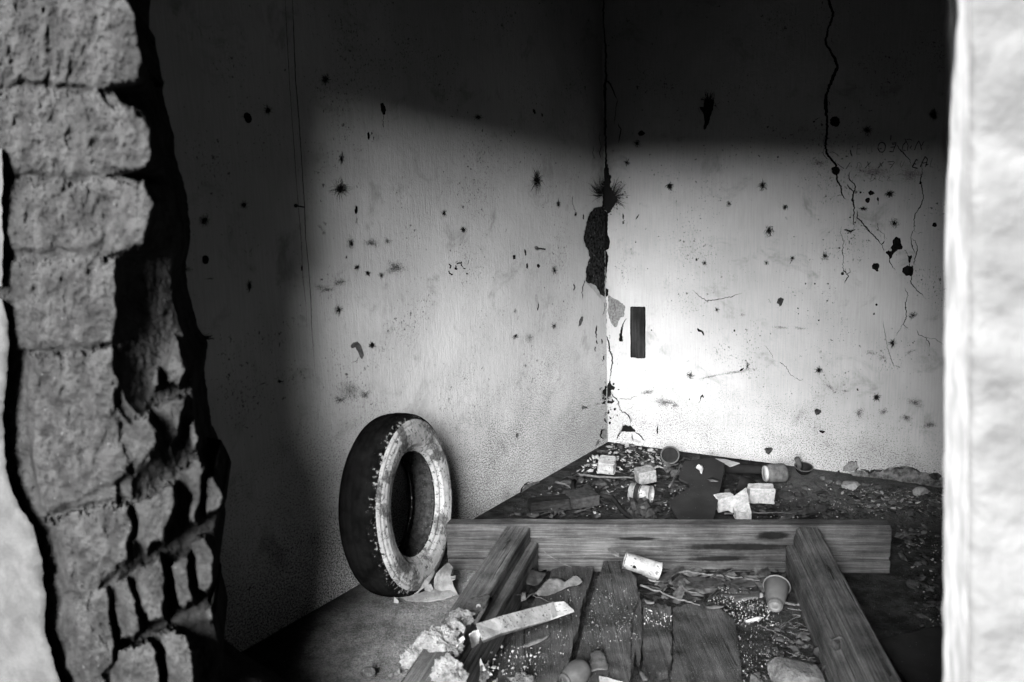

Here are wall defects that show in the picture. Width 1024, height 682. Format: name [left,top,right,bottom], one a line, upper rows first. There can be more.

crack [823,0,885,281]
spalling [573,181,639,327]
crack [594,303,636,423]
crack [883,145,937,366]